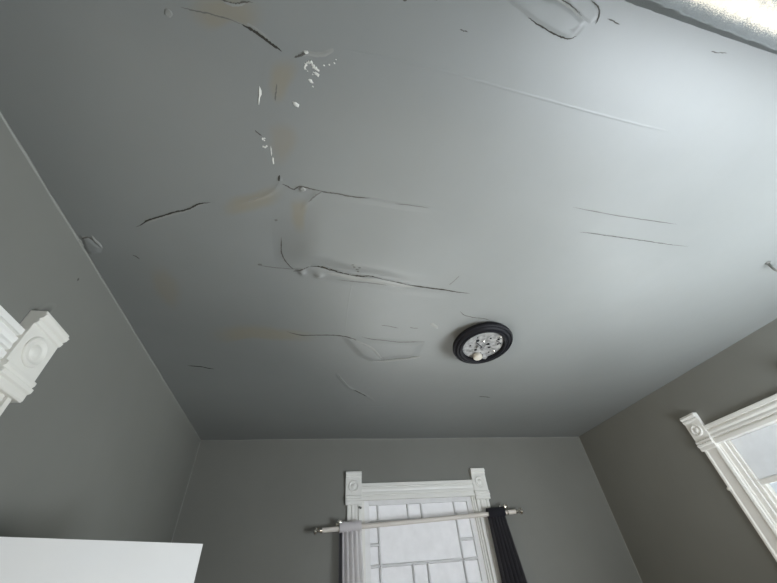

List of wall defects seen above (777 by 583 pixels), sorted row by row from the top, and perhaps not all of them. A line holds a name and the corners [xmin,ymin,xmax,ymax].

crack [182,0,334,58]
crack [139,202,210,226]
crack [573,207,671,224]
crack [583,232,688,247]